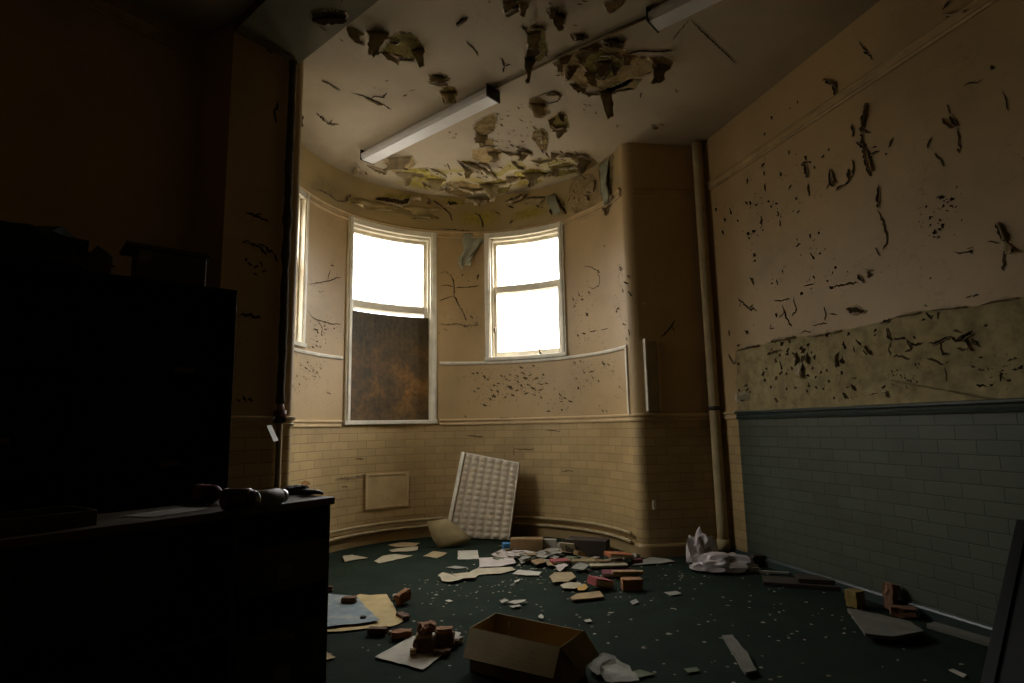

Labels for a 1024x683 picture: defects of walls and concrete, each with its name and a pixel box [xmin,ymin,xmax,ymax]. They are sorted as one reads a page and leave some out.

peeling [310,0,674,269]
crack [439,272,479,334]
peeling [465,359,622,417]